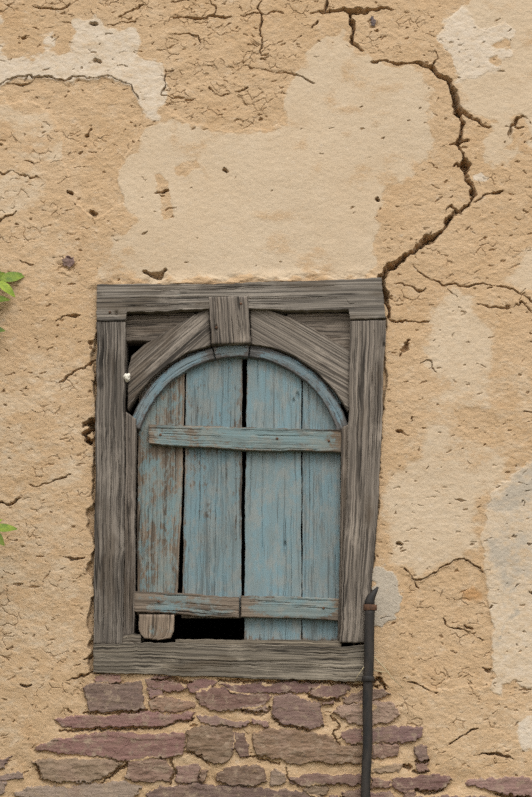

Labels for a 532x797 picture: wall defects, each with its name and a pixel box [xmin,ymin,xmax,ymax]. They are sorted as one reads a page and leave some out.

crack [33,2,72,10]
crack [102,3,144,26]
crack [170,0,316,97]
crack [0,73,139,99]
crack [160,68,186,100]
flaking render [0,0,532,291]
crack [310,0,532,441]
crack [55,312,81,321]
crack [0,473,72,507]
crack [58,334,97,681]
flaking render [382,287,532,695]
crack [404,557,485,589]